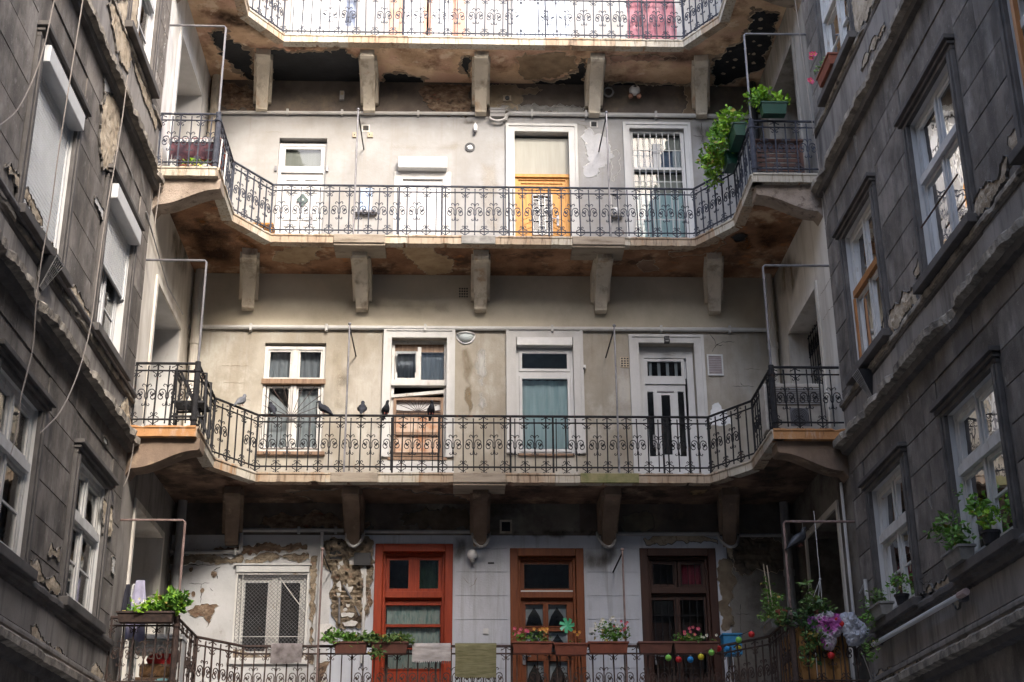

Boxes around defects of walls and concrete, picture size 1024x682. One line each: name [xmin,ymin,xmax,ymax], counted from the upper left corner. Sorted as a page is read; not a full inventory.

peeling [207,27,256,111]
peeling [488,51,588,112]
peeling [710,6,781,87]
spalling [98,75,122,172]
peeling [581,128,614,178]
spalling [960,128,1017,220]
spalling [881,258,920,334]
peeling [359,486,470,530]
spalling [167,488,375,682]